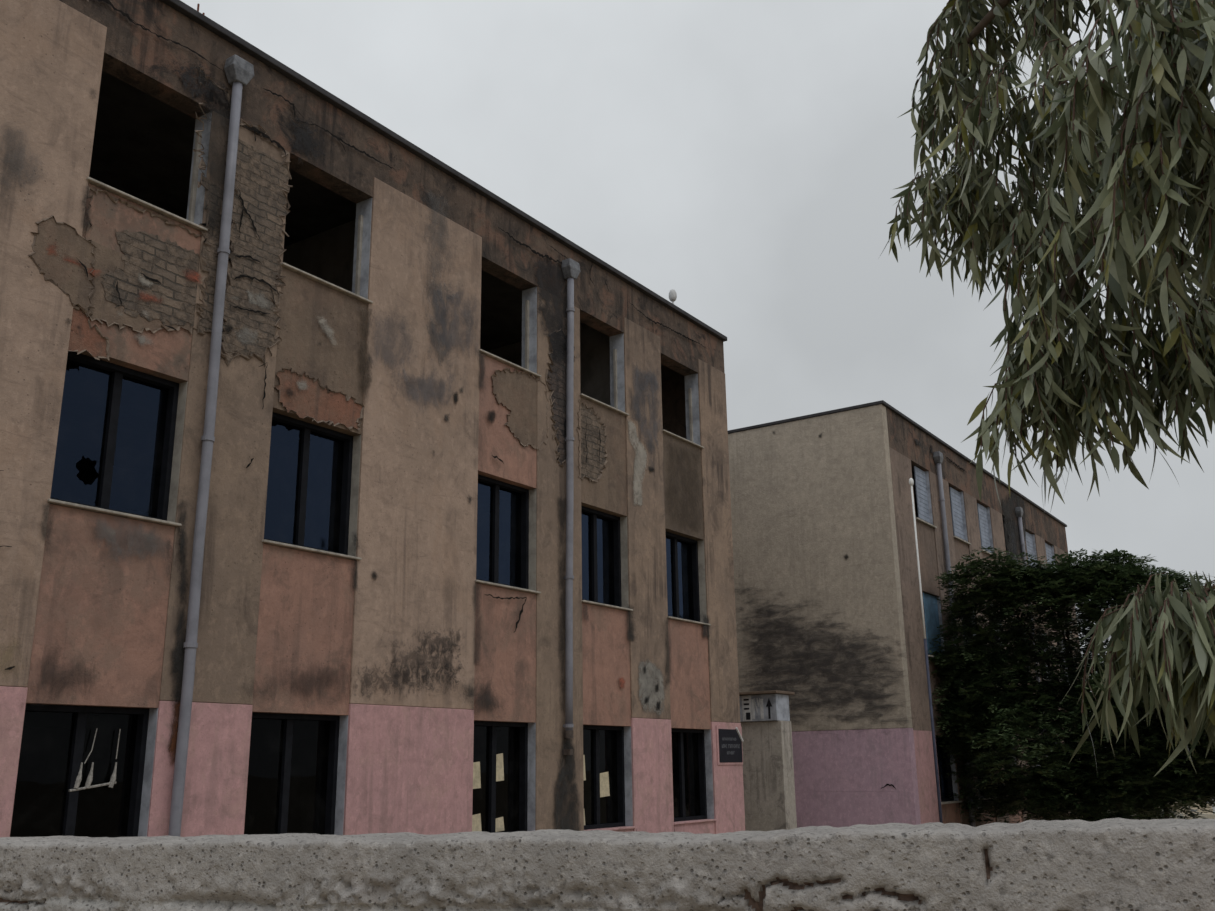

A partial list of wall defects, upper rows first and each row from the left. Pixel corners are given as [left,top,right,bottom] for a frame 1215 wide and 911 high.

crack [87,0,224,72]
crack [245,88,397,172]
flaking render [28,67,364,431]
peeling [488,328,608,482]
water stain [745,601,896,722]
crack [984,849,993,879]